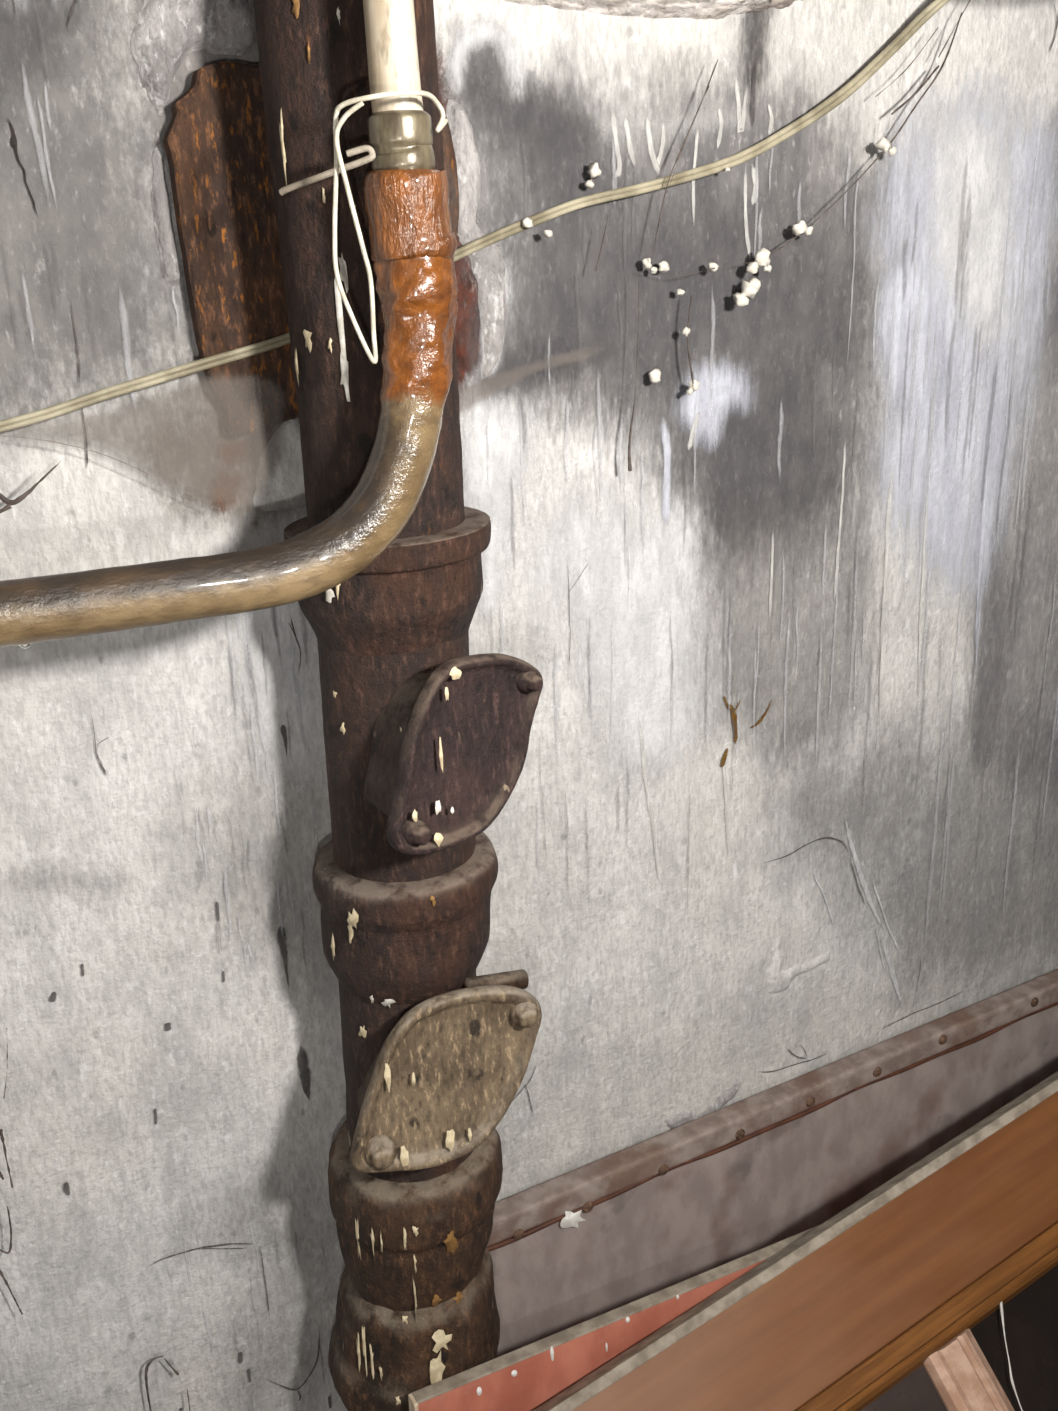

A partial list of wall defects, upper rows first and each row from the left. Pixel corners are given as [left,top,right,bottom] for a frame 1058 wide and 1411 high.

damp [0,0,193,409]
flaking render [130,0,259,286]
damp [451,8,1058,876]